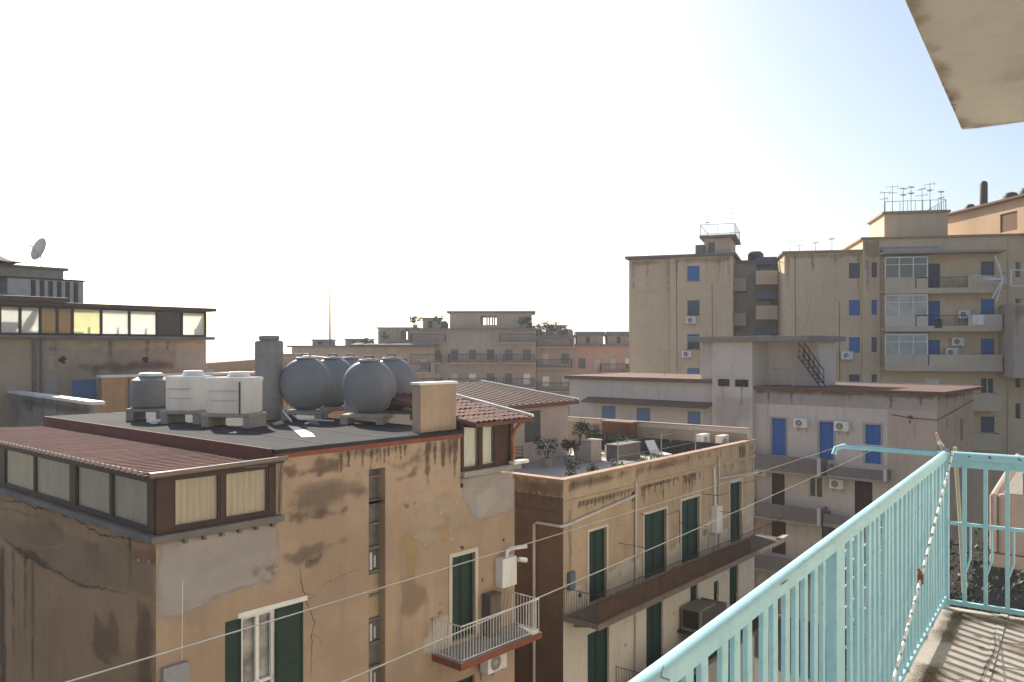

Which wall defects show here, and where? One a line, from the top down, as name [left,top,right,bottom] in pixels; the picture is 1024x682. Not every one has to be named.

water stain [907,0,1024,130]
water stain [284,438,459,524]
water stain [511,445,753,514]
crack [2,499,215,563]
crack [299,568,353,663]